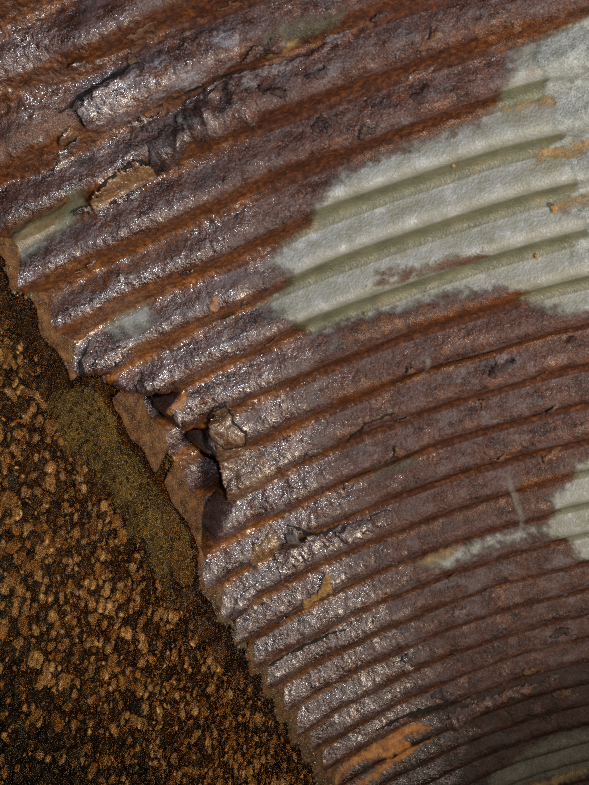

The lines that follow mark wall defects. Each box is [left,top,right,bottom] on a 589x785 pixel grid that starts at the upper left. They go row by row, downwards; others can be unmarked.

rust [464,11,579,50]
rust [0,99,84,166]
crack [59,62,140,114]
rust [76,27,242,133]
rust [175,70,260,143]
rust [89,160,155,213]
rust [351,287,529,340]
crack [200,402,226,456]
rust [207,404,247,450]
rust [249,529,281,566]
rust [274,527,335,580]
rust [367,662,589,785]